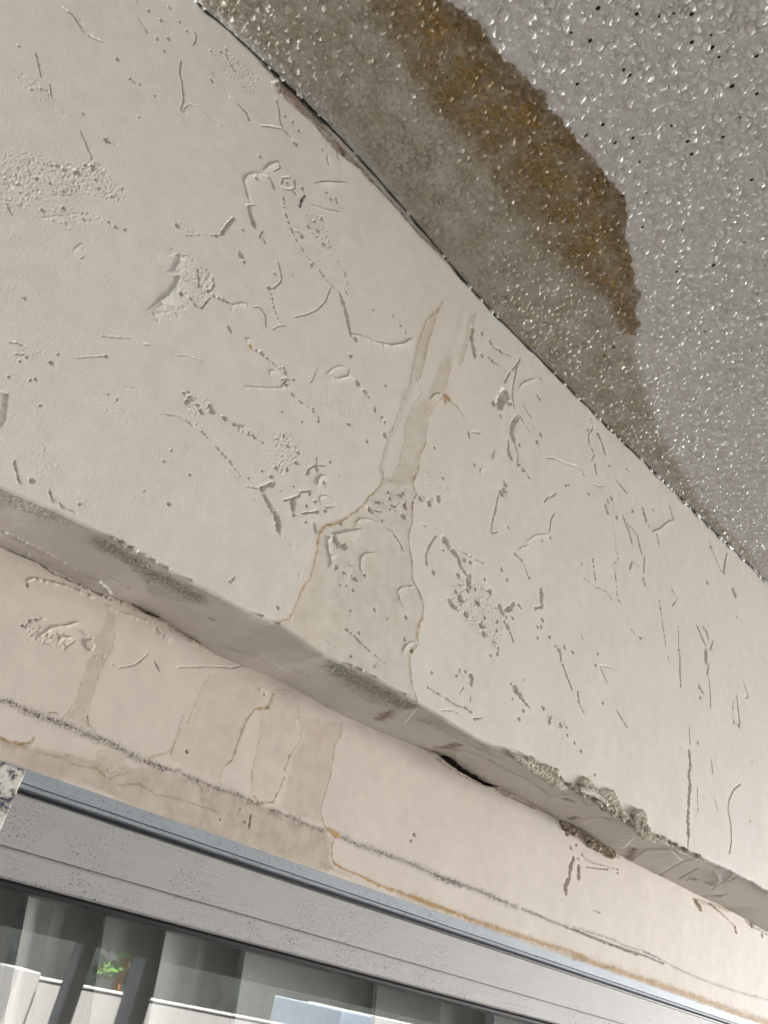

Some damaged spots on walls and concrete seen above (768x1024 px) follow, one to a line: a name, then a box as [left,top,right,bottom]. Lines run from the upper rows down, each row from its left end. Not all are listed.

flaking render [0,42,129,234]
flaking render [144,224,229,336]
crack [161,2,763,581]
damp [386,0,637,320]
flaking render [180,388,575,659]
crack [0,692,768,1002]
flaking render [325,653,708,874]